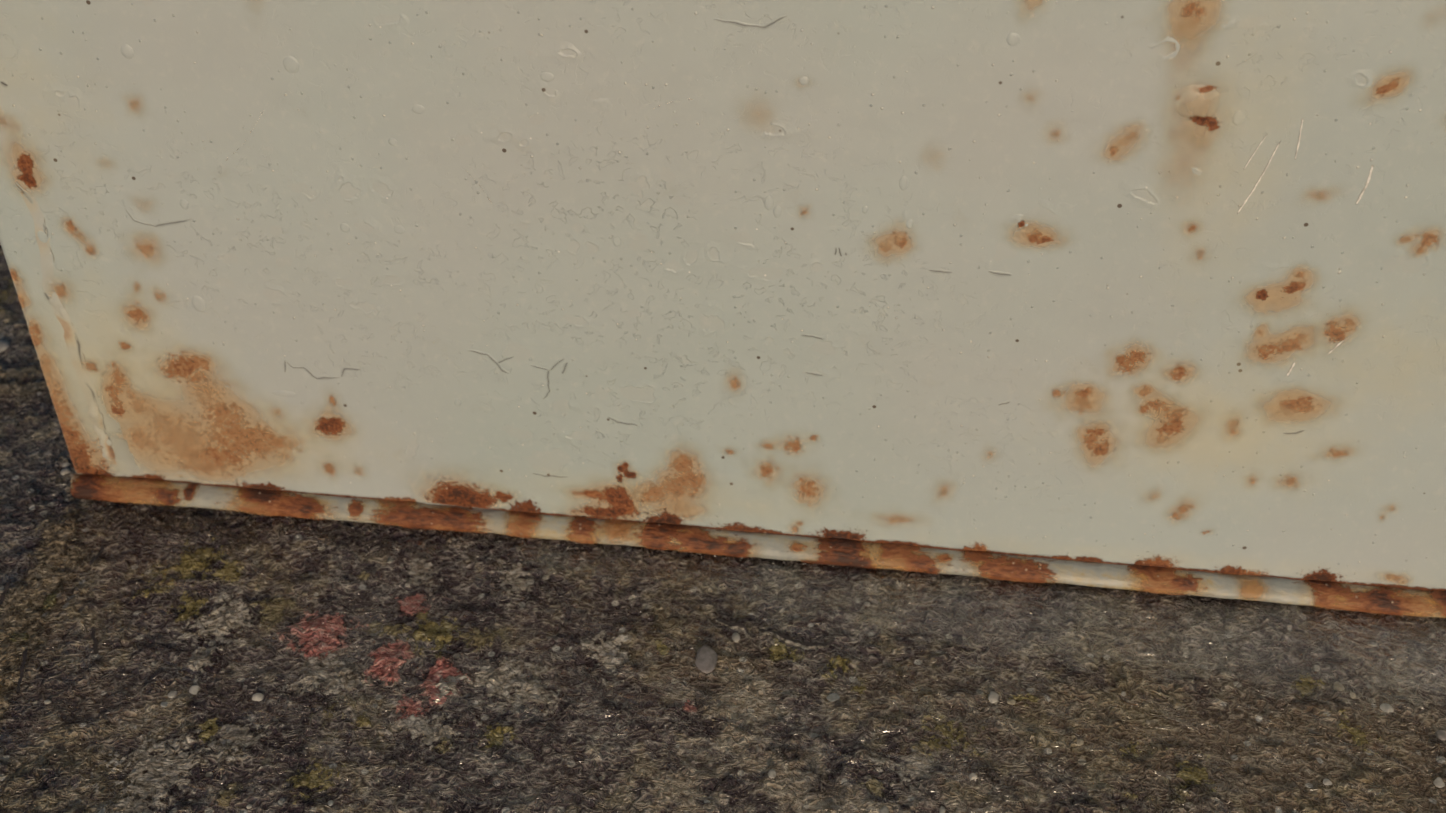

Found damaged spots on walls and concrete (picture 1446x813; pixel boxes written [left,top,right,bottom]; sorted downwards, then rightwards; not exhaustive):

corrosion [1374,75,1408,96]
corrosion [14,146,39,188]
corrosion [878,233,911,254]
corrosion [1017,221,1055,246]
corrosion [1403,232,1437,253]
corrosion [9,269,29,307]
corrosion [125,307,149,328]
corrosion [1248,269,1357,362]
corrosion [29,323,1446,617]